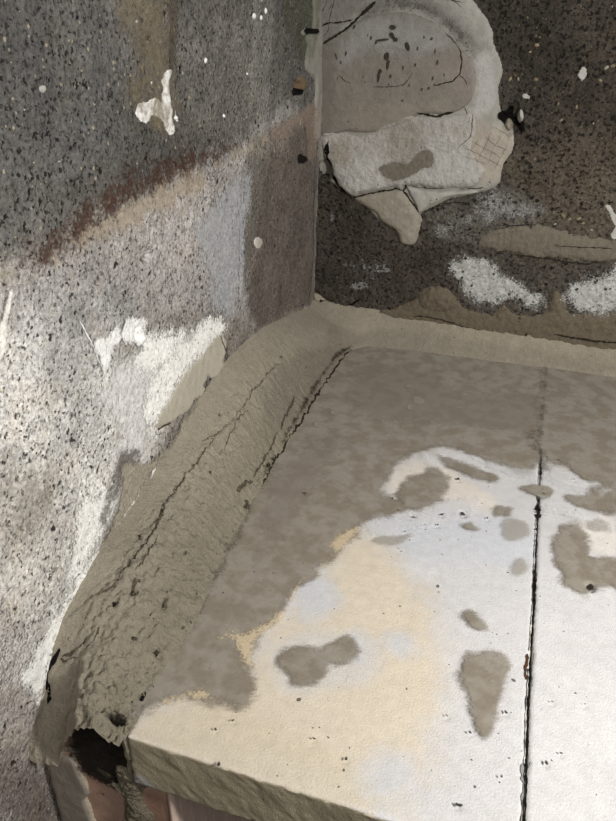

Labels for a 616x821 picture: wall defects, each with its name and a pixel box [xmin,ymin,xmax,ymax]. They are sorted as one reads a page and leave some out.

crack [322,1,376,44]
crack [433,35,468,86]
crack [418,108,473,148]
crack [324,141,483,212]
crack [509,245,612,265]
crack [260,347,352,484]
crack [98,366,276,595]
leakage [127,346,616,740]
crack [522,449,542,821]